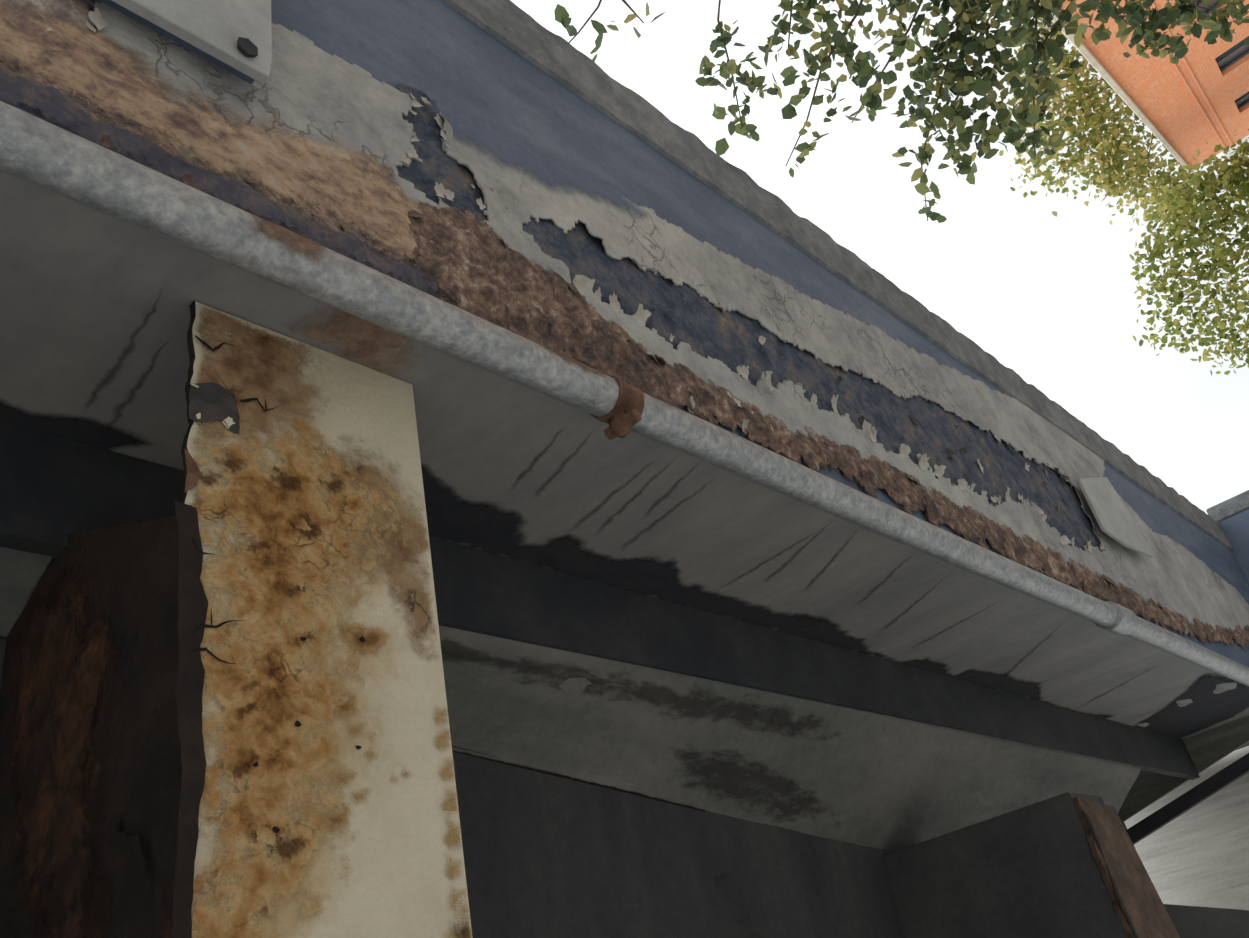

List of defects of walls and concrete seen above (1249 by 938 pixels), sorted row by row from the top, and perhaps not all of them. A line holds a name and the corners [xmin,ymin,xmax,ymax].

peeling [397,84,642,224]
peeling [189,381,240,434]
corrosion [0,0,1249,648]
peeling [522,217,1104,553]
corrosion [171,307,435,938]
damp [441,641,825,739]
corrosion [441,761,472,938]
damp [685,752,818,821]